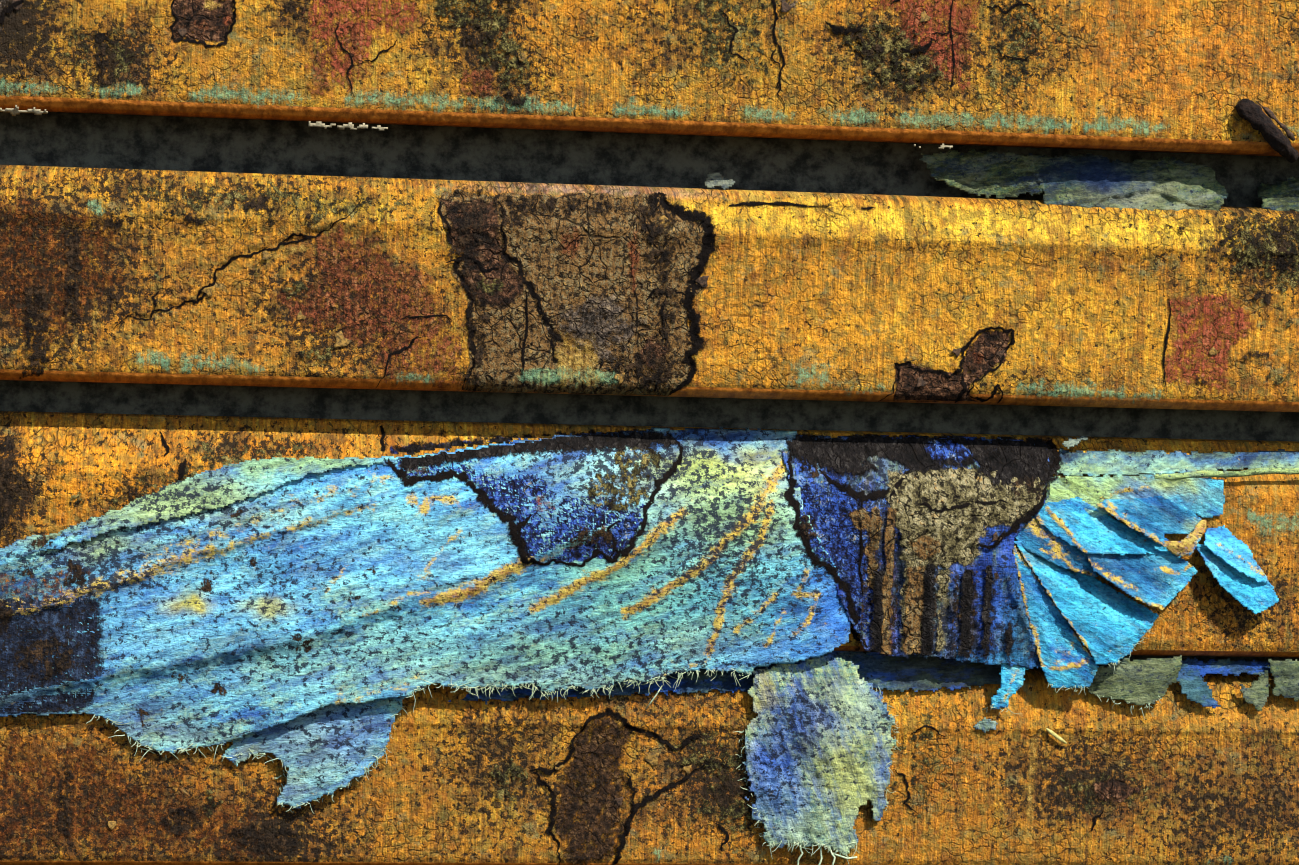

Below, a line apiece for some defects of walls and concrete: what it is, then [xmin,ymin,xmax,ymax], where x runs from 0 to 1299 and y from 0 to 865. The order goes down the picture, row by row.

spalling [170,0,237,48]
crack [668,0,791,114]
rust [875,0,979,91]
crack [115,197,362,330]
peeling [437,184,719,396]
peeling [878,326,1016,403]
rust [1162,293,1293,393]
peeling [380,425,683,567]
peeling [784,450,892,648]
peeling [490,707,730,865]